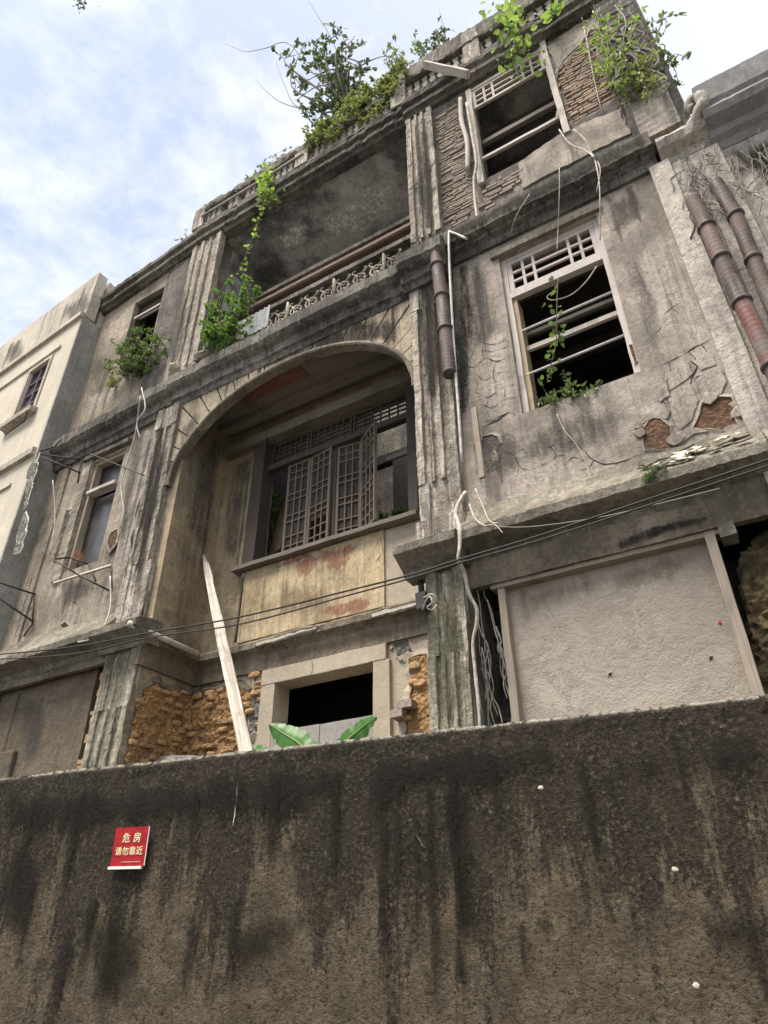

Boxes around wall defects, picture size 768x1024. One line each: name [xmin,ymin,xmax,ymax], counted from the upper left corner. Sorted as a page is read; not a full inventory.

flaking render [434,16,631,228]
crack [463,314,648,476]
flaking render [634,350,753,469]
spalling [13,452,41,555]
spalling [116,671,262,765]
leakage [53,894,138,1002]
leakage [0,767,341,934]
leakage [368,744,550,1013]